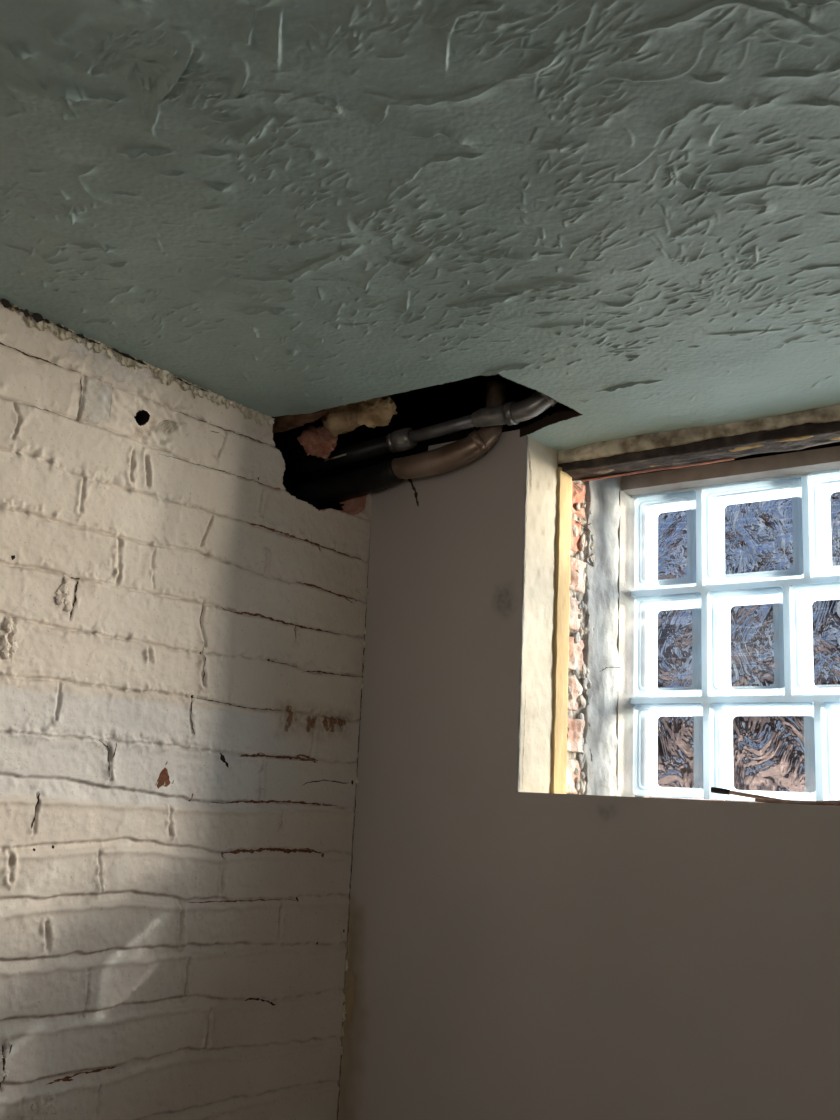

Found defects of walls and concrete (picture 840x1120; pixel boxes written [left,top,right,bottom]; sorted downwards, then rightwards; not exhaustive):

spalling [318,493,368,516]
rust [307,716,346,732]
peeling [156,761,174,789]